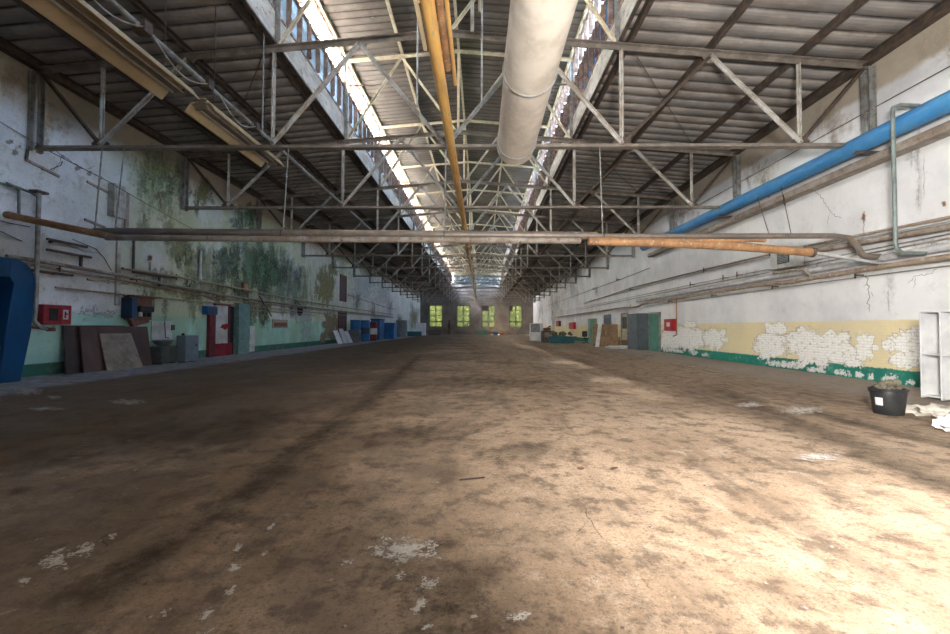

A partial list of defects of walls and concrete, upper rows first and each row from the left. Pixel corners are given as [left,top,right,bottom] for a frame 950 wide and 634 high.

water stain [144,241,308,327]
peeling [661,321,729,357]
peeling [752,322,920,386]